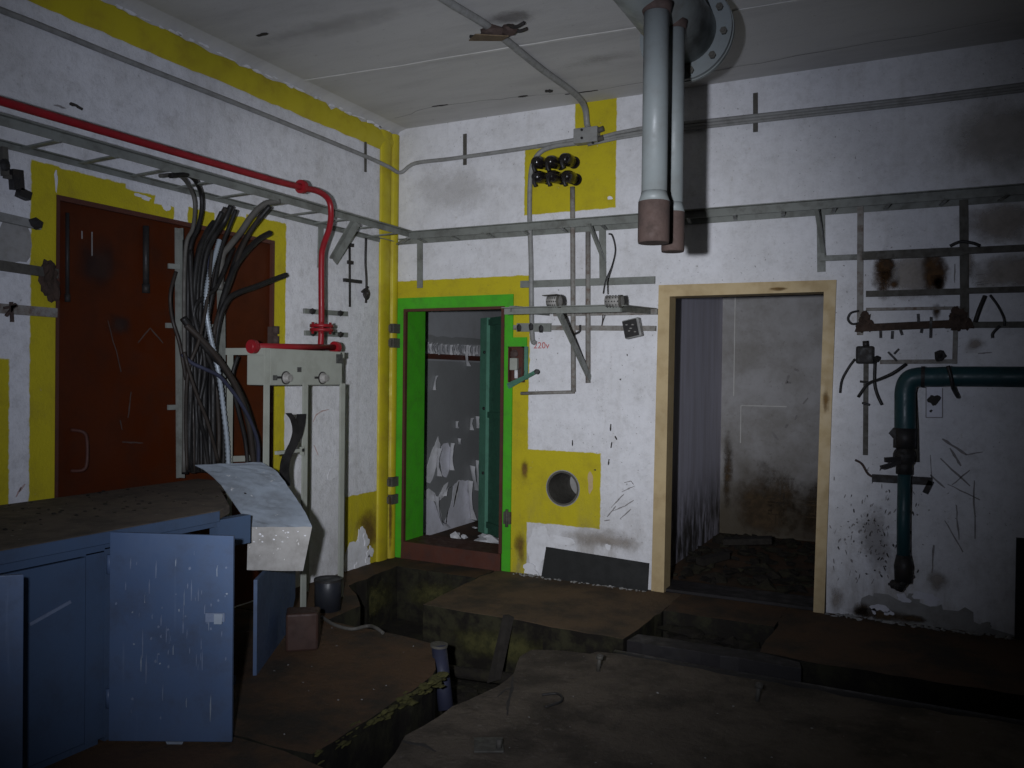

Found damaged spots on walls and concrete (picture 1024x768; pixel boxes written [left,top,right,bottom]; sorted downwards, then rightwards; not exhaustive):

peeling [115,4,390,132]
rust [875,259,898,290]
rust [923,257,946,289]
peeling [423,416,479,535]
water stain [724,447,732,500]
water stain [742,479,817,534]
peeling [344,526,374,572]
water stain [580,535,630,547]
flaking render [854,591,1014,637]